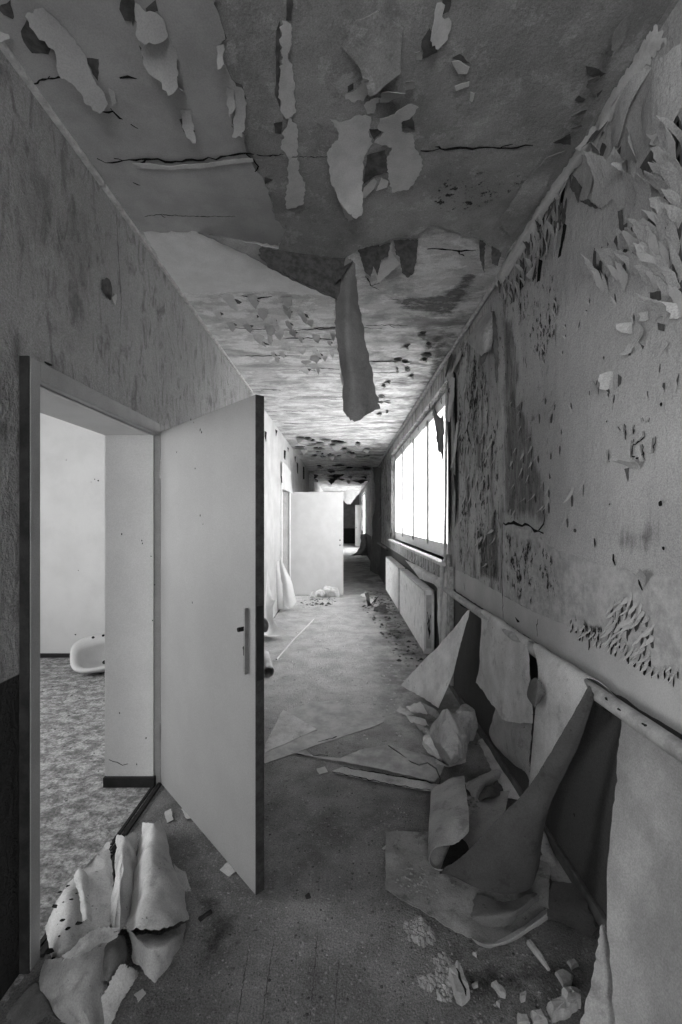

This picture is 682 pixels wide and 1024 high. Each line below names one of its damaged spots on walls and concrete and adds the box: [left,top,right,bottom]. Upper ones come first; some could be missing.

crack [97,152,327,185]
peeling [0,0,682,409]
crack [421,144,533,152]
peeling [284,437,391,537]
crack [501,516,545,635]